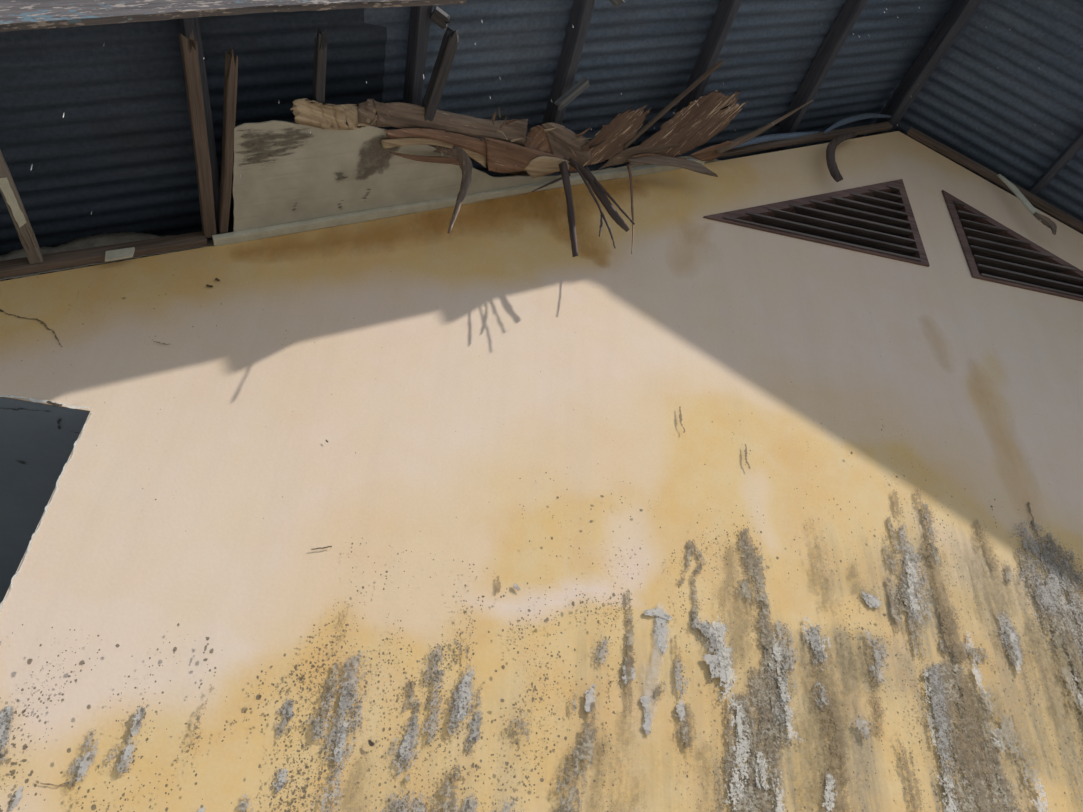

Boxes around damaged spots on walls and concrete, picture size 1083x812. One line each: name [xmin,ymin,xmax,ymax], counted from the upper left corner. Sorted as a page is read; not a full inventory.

crack [0,309,62,347]
peeling [0,395,93,614]
damp [0,627,100,812]
peeling [104,706,147,774]
damp [60,637,223,812]
peeling [572,684,599,743]
peeling [640,605,673,735]
peeling [689,615,737,708]
peeling [802,617,831,710]
damp [661,466,1083,812]
peeling [1003,625,1023,674]
peeling [822,774,837,812]